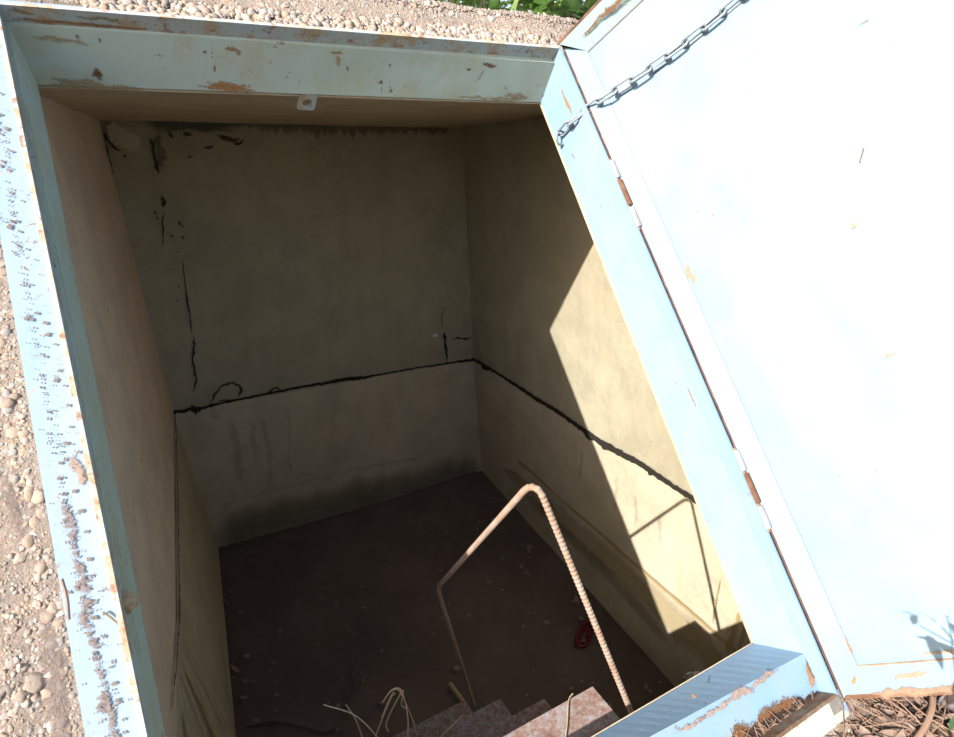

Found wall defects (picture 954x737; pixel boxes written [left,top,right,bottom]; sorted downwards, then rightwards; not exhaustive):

rust [8,8,146,45]
rust [582,0,625,36]
rust [54,68,141,90]
rust [199,65,256,93]
crack [150,139,166,247]
crack [172,261,697,709]
rust [733,660,819,737]
rust [872,671,954,699]